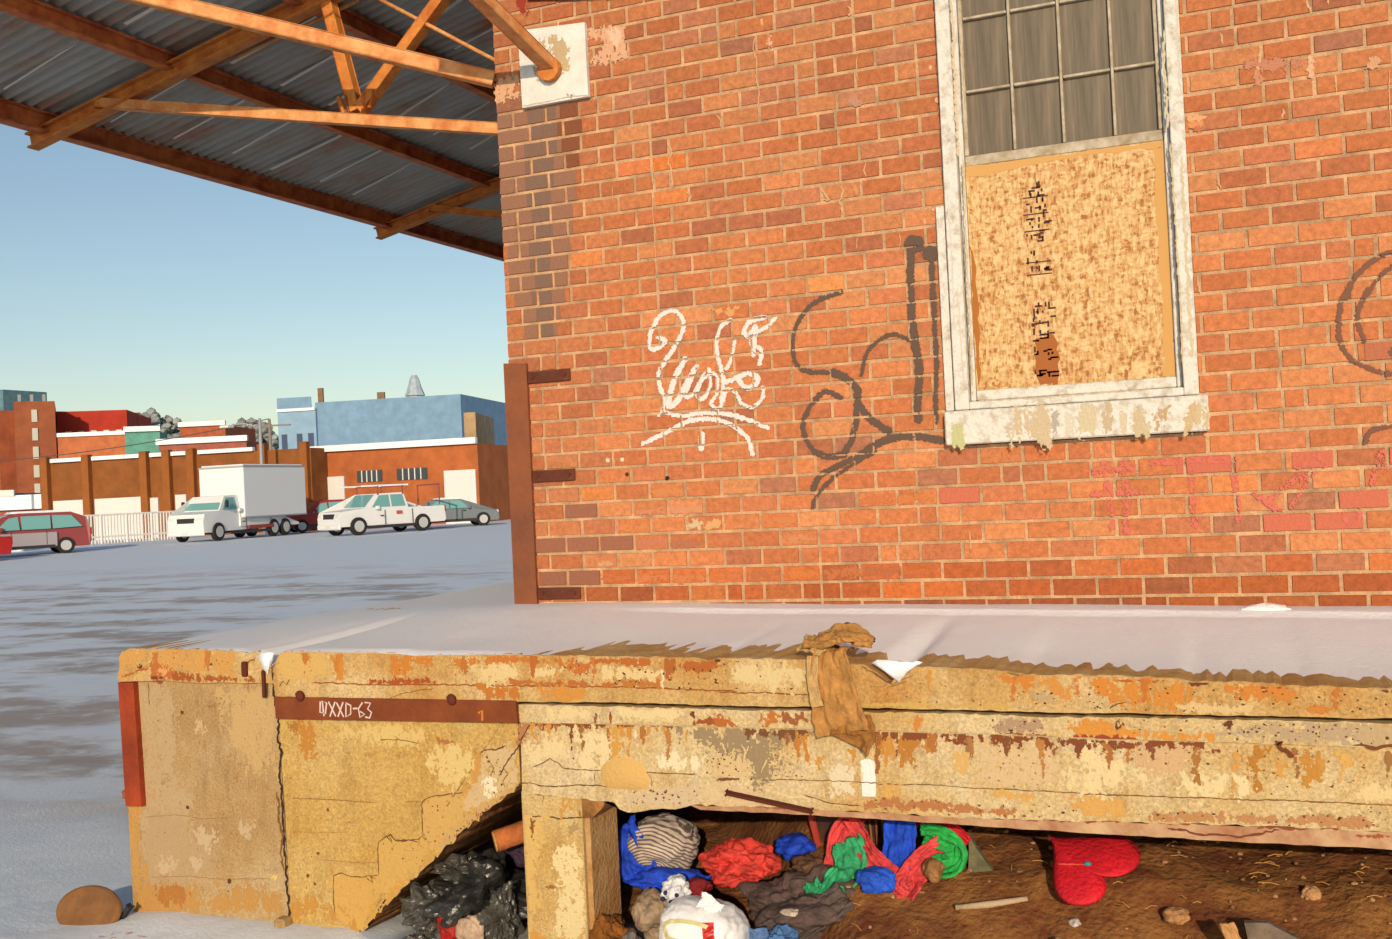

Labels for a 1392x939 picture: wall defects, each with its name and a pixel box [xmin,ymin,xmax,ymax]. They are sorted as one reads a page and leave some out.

spalling [137,662,178,681]
rust [369,655,436,685]
rust [451,655,720,721]
crack [164,665,809,916]
rust [529,711,826,771]
spalling [619,751,814,815]
spalling [974,736,1065,792]
rust [863,673,1392,839]
spalling [1115,719,1204,786]
spalling [1213,721,1392,747]